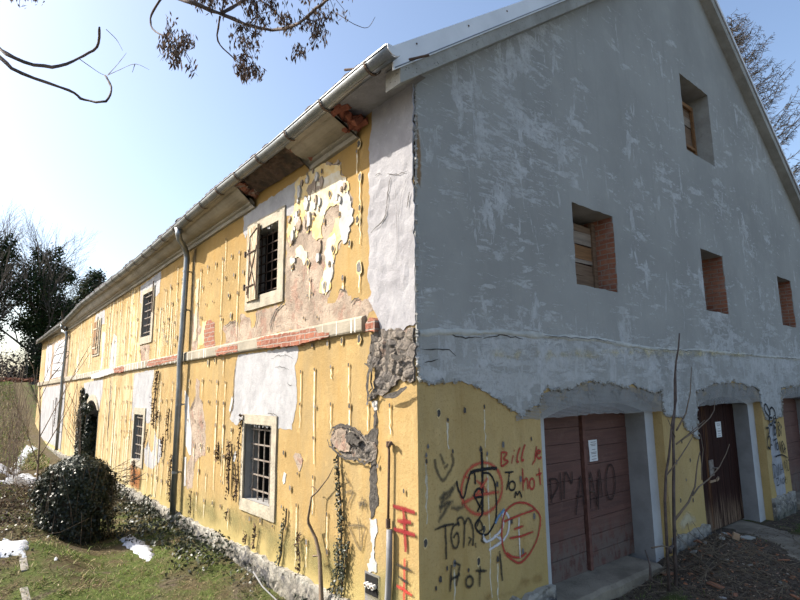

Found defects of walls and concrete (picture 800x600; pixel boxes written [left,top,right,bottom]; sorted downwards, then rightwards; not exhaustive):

crack [373,171,410,230]
damp [69,289,173,379]
damp [190,249,199,340]
peeling [192,139,418,469]
damp [101,388,129,483]
damp [146,408,160,497]
peeling [144,428,168,496]
peeling [184,378,236,530]